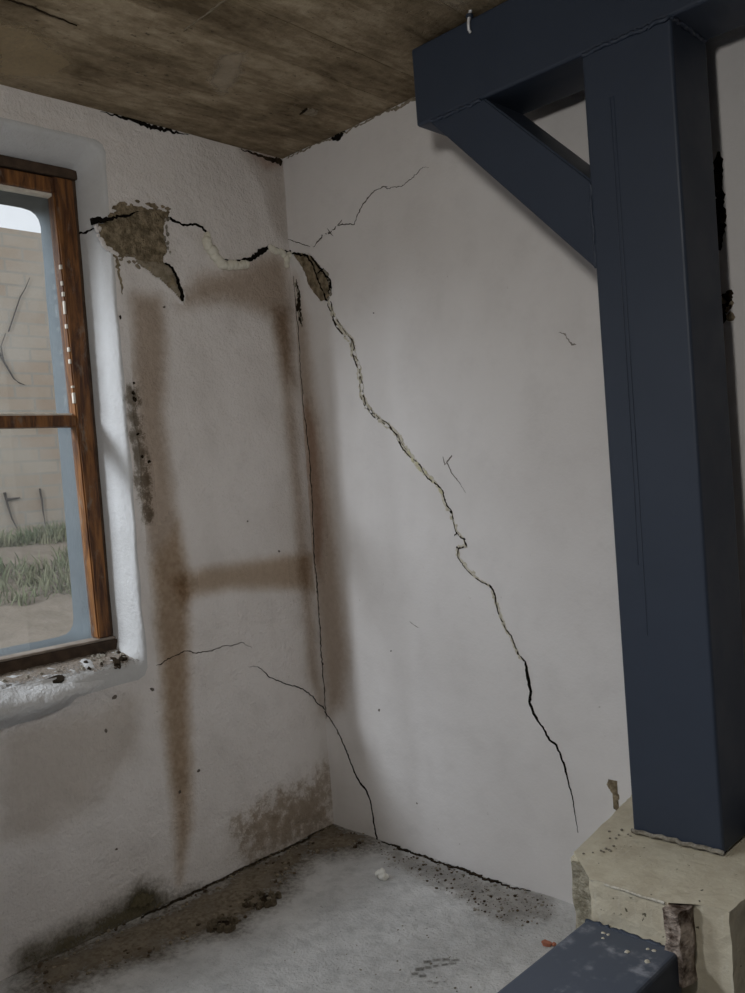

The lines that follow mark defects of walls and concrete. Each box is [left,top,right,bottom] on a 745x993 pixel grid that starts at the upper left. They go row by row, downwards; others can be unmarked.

spalling [713,152,727,250]
spalling [90,200,186,308]
spalling [290,243,339,327]
spalling [721,290,735,324]
crack [156,167,531,892]
crack [327,297,578,832]
leakage [18,887,180,973]